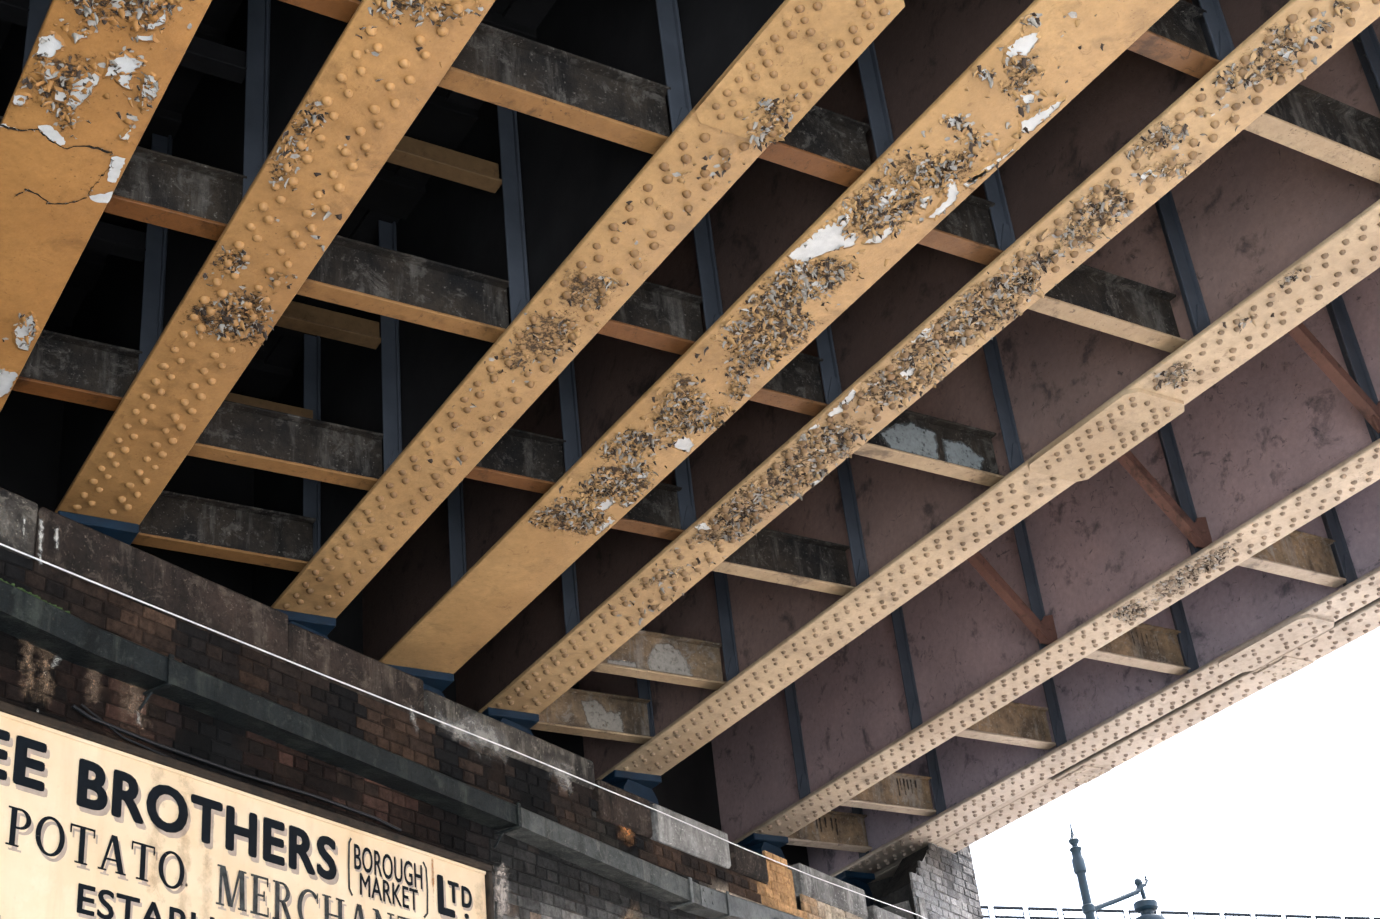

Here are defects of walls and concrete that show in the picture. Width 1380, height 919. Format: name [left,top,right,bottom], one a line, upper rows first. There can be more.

peeling [12,0,195,143]
peeling [356,0,484,56]
crack [0,124,126,204]
peeling [267,96,350,252]
peeling [0,359,19,399]
peeling [2,311,41,352]
peeling [181,245,298,347]
peeling [469,200,661,420]
peeling [527,0,1352,626]